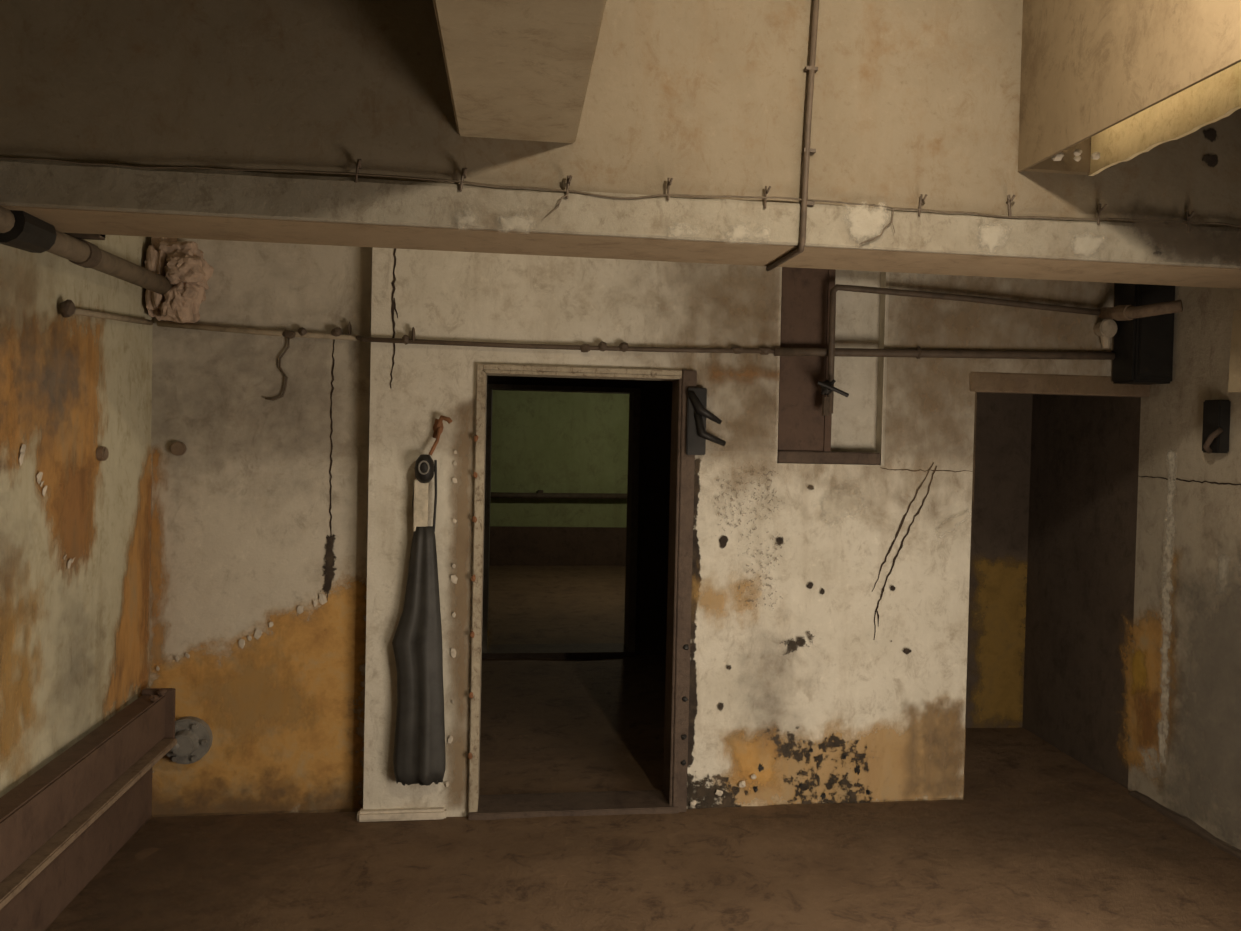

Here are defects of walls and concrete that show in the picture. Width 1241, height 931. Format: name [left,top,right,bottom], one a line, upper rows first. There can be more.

peeling [845,203,889,240]
peeling [0,315,104,572]
peeling [150,534,367,816]
spalling [687,459,886,809]
crack [872,462,973,639]
corrosion [1119,557,1178,783]